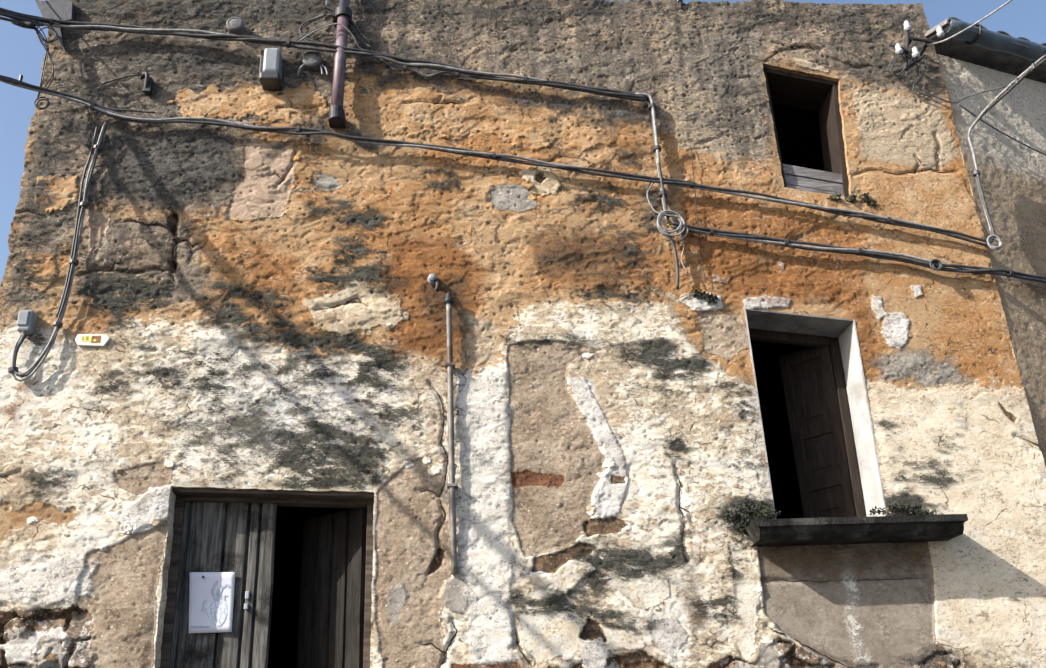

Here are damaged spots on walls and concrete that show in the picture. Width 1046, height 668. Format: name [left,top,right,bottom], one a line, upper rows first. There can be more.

damp [74,0,335,102]
damp [349,25,652,149]
damp [734,7,939,86]
crack [857,134,951,175]
crack [84,209,207,285]
damp [75,269,423,490]
peeling [0,461,175,668]
crack [421,384,457,554]
peeling [374,339,689,668]
damp [502,332,775,579]
peeling [709,542,845,668]
flaking render [914,645,965,668]